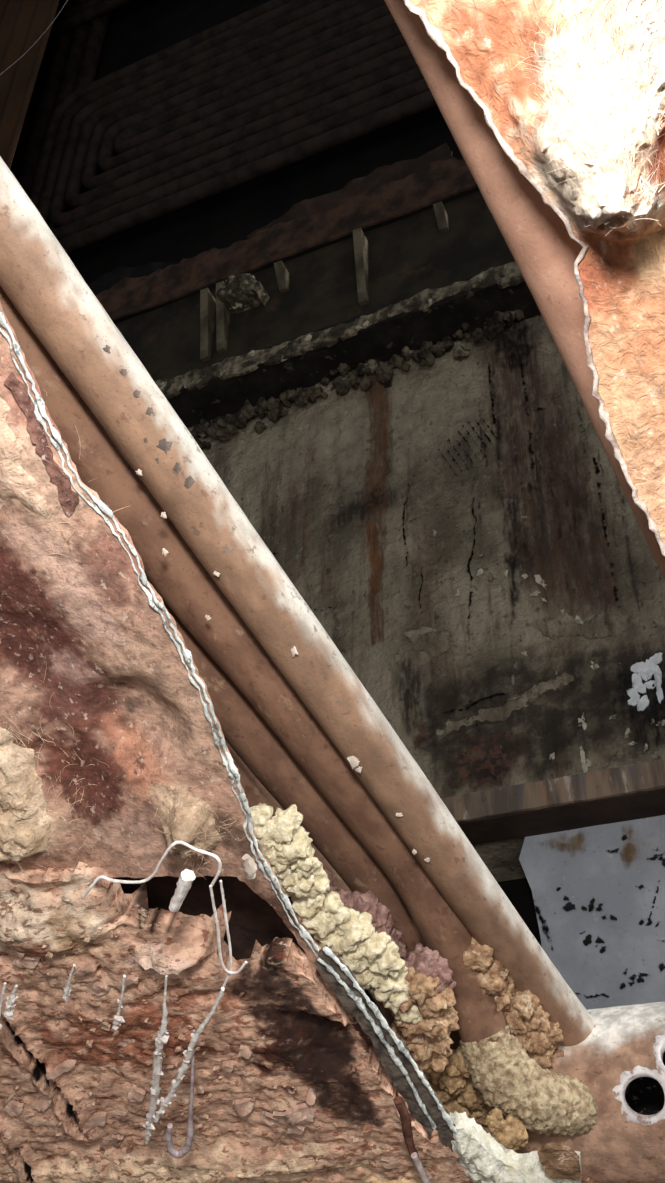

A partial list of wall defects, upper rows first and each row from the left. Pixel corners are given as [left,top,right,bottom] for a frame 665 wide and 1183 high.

rust [0,562,64,676]
rust [365,375,392,645]
crack [463,480,509,649]
leakage [480,322,638,618]
crack [444,693,505,731]
leakage [396,642,665,786]
rust [61,735,145,826]
crack [15,1147,33,1183]
crack [5,1020,79,1125]
peeling [46,1059,135,1183]
peeling [77,957,256,1148]